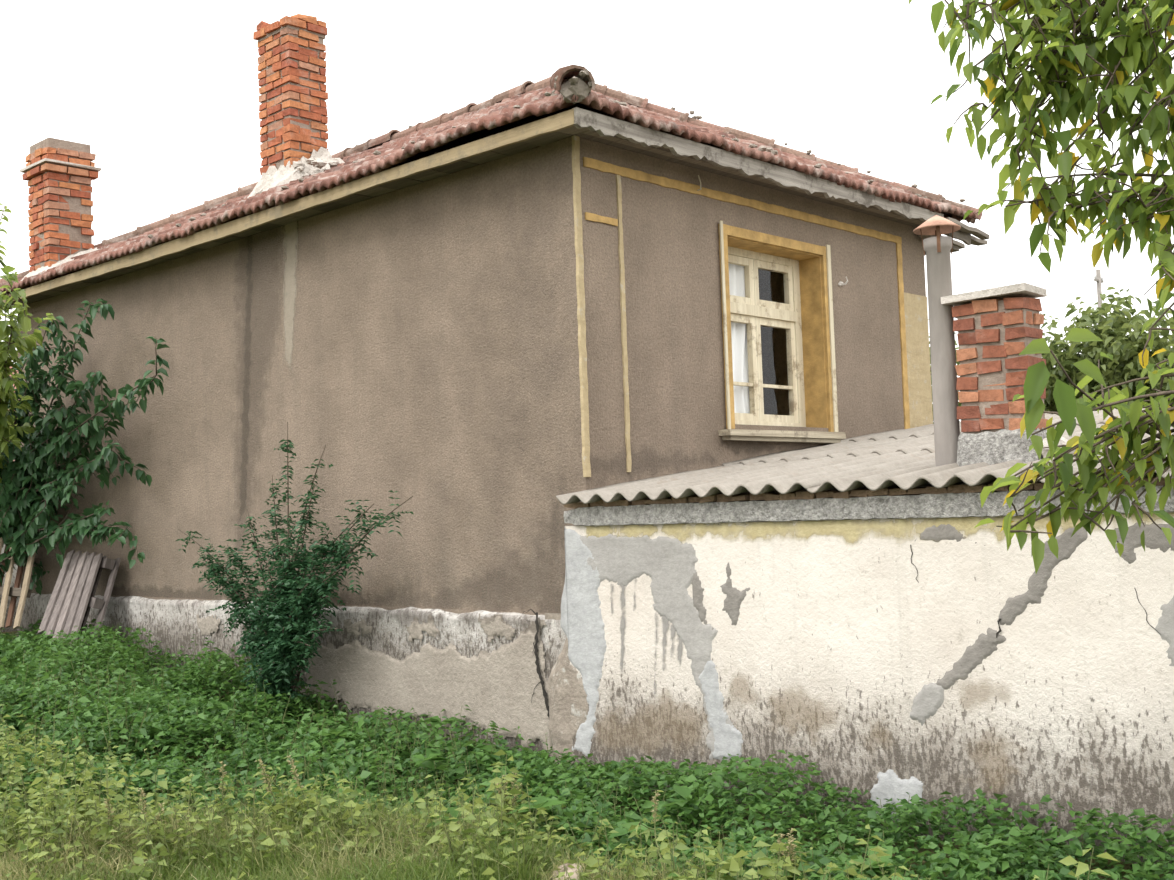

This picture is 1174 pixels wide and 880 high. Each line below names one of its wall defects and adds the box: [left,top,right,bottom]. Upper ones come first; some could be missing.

flaking render [915,524,985,546]
flaking render [1114,522,1174,564]
flaking render [300,613,550,755]
crack [523,609,549,717]
peeling [561,559,569,647]
peeling [699,660,743,759]
flaking render [720,562,750,626]
peeling [910,683,944,726]
flaking render [1155,596,1174,666]